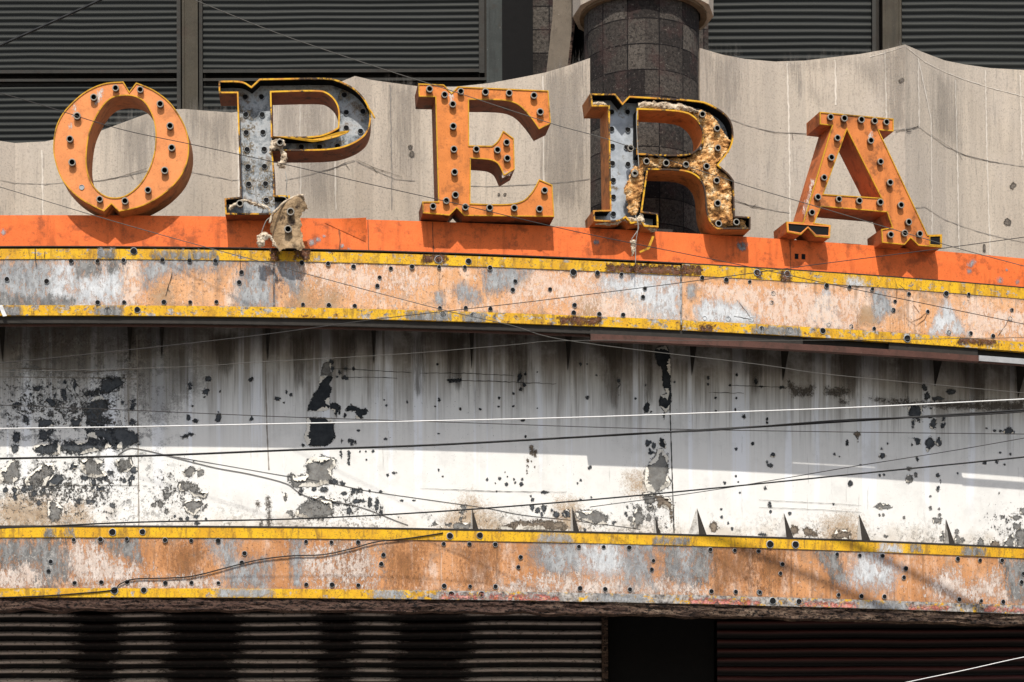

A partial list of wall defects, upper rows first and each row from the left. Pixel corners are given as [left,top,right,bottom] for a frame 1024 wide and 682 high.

corrosion [293,250,311,261]
corrosion [421,253,449,264]
corrosion [605,262,703,276]
corrosion [557,300,602,326]
corrosion [958,337,999,347]
peeling [634,346,676,420]
leakage [786,379,849,405]
leakage [869,397,1024,411]
peeling [0,359,404,599]
peeling [428,435,760,605]